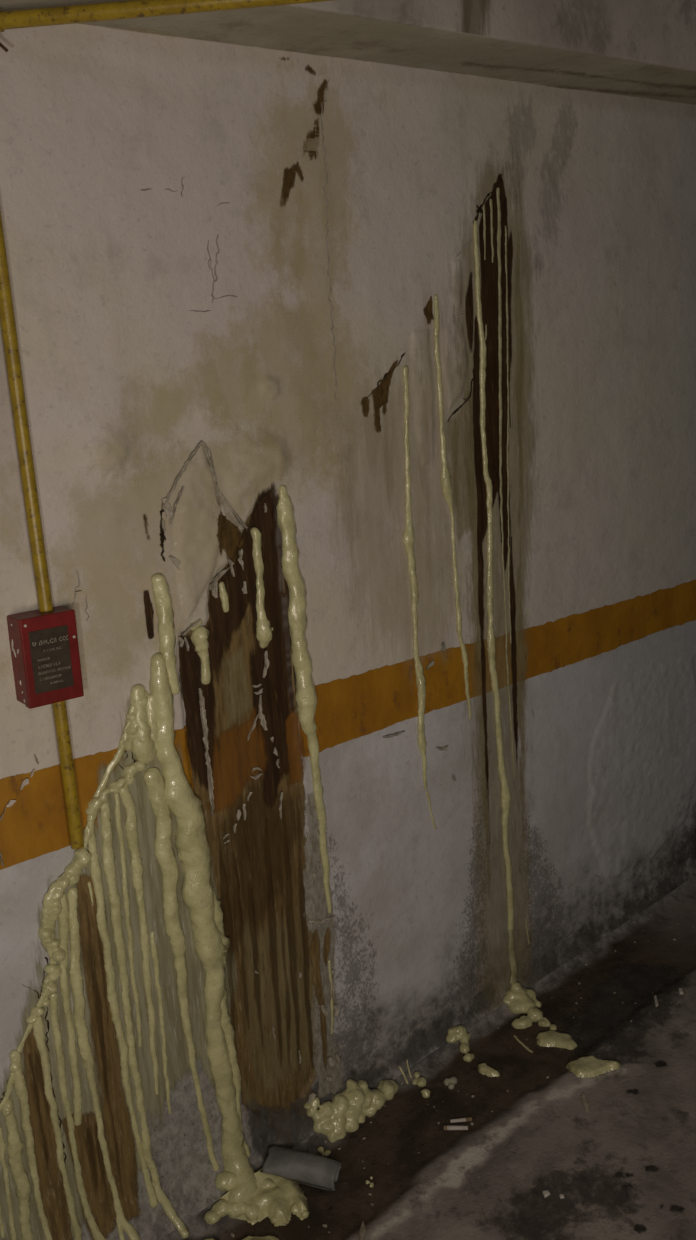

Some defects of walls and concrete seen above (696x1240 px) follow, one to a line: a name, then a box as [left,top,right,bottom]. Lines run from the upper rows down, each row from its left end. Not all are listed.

rust [23,874,140,1240]
spalling [72,1054,225,1240]
rust [217,512,244,563]
damp [0,573,493,1240]
damp [250,527,273,649]
damp [276,485,332,913]
rust [308,915,343,1098]
damp [402,366,437,829]
damp [433,294,472,720]
rust [466,174,518,803]
damp [473,187,696,1065]